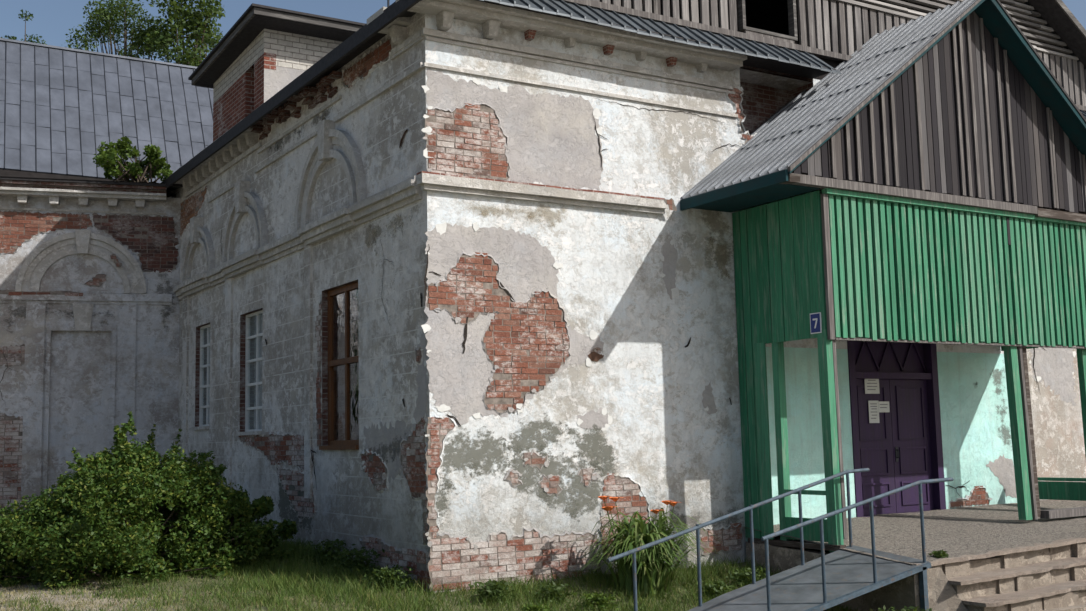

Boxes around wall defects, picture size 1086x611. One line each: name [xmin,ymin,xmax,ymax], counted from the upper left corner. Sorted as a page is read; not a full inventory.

spalling [341,36,394,90]
peeling [421,69,603,190]
spalling [0,186,209,296]
spalling [0,412,30,512]
spalling [236,301,322,522]
peeling [359,221,651,593]
water stain [435,413,616,521]
spalling [948,486,992,508]
peeling [986,454,1017,498]
peeling [1026,347,1086,482]